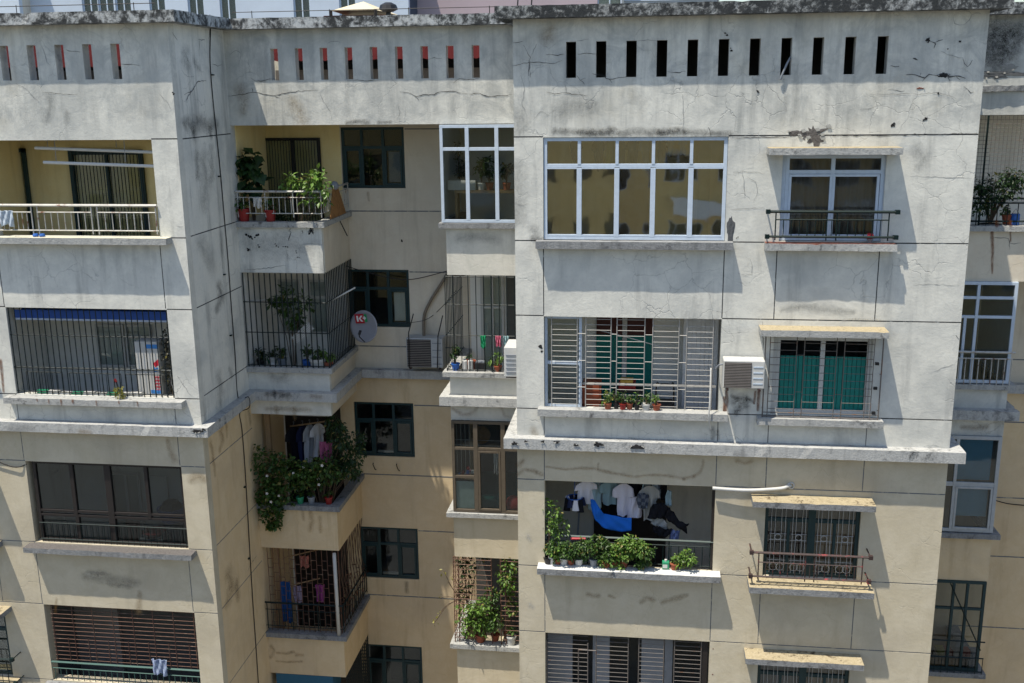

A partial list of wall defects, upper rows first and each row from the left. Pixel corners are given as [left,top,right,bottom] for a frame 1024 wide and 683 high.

crack [162,32,332,119]
crack [398,39,629,120]
spalling [787,124,832,147]